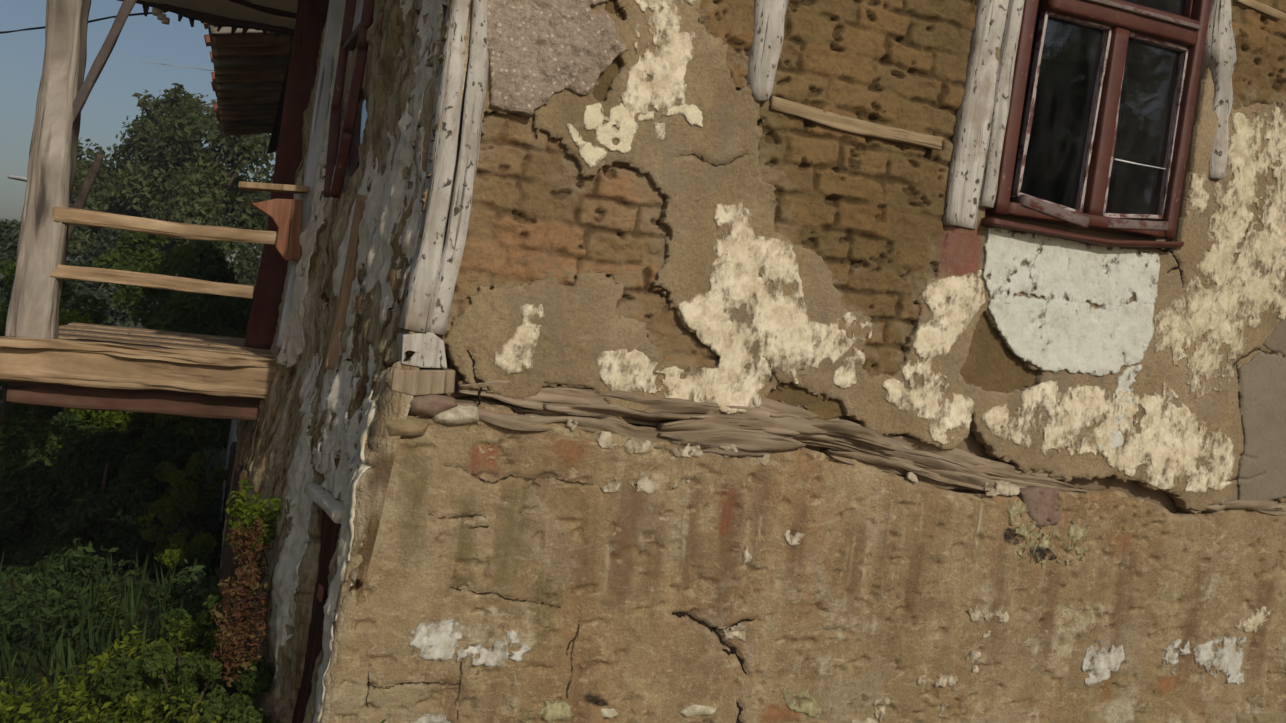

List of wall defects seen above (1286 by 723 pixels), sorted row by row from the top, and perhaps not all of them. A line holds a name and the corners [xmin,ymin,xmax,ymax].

crack [677,153,742,167]
spalling [434,0,1286,494]
peeling [268,0,450,723]
peeling [410,619,531,667]
crack [451,587,580,698]
crack [672,611,755,723]
peeling [1081,640,1125,686]
peeling [1162,606,1271,684]